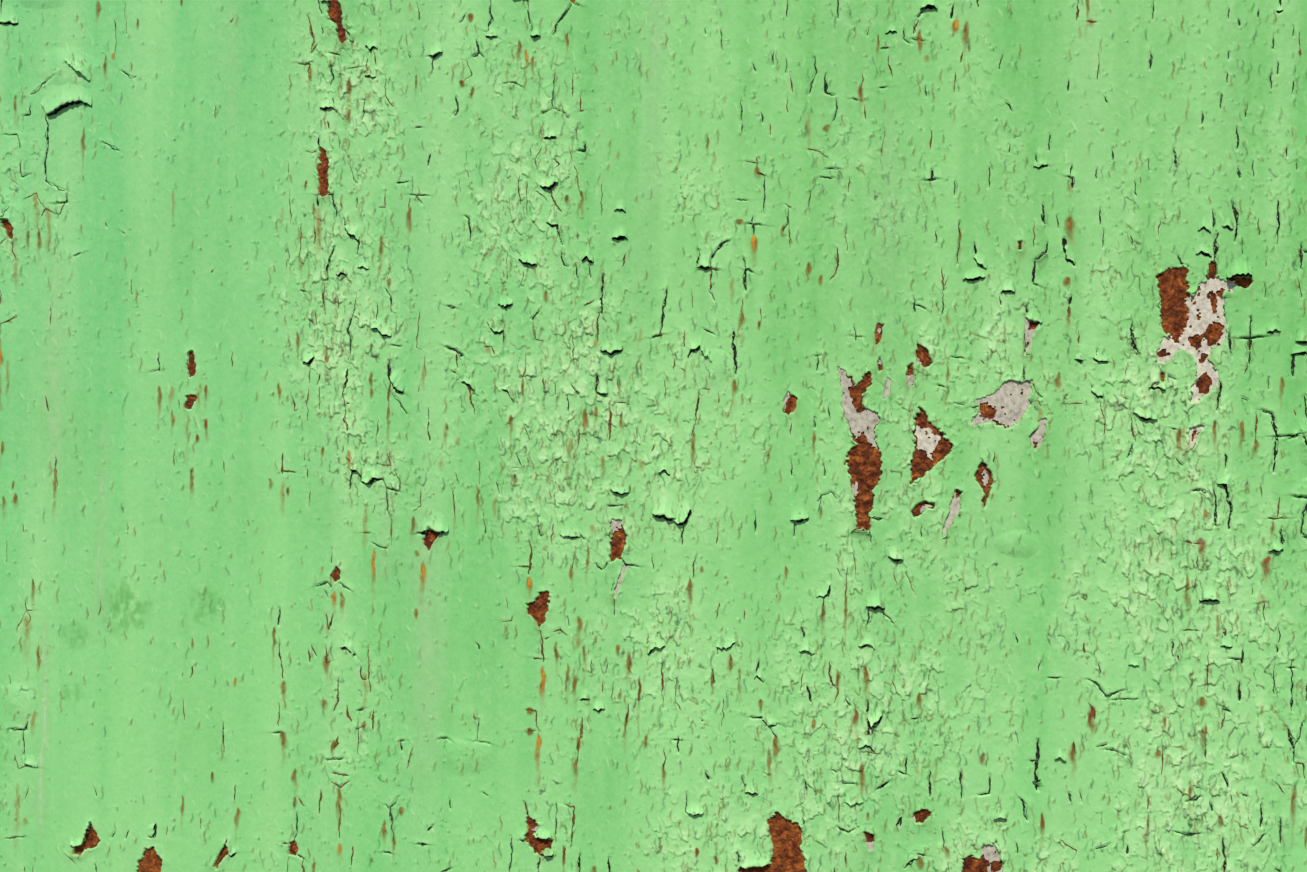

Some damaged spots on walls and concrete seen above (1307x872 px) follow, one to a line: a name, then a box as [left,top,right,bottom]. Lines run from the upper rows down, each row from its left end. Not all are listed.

peeling [40,59,92,116]
crack [654,0,983,435]
crack [988,135,1177,195]
crack [288,0,667,548]
crack [999,204,1138,457]
rust [1155,262,1252,400]
rust [837,323,884,531]
rust [909,408,960,517]
crack [518,517,654,615]
rust [524,803,565,863]
rust [738,812,811,872]
rust [945,843,1008,872]